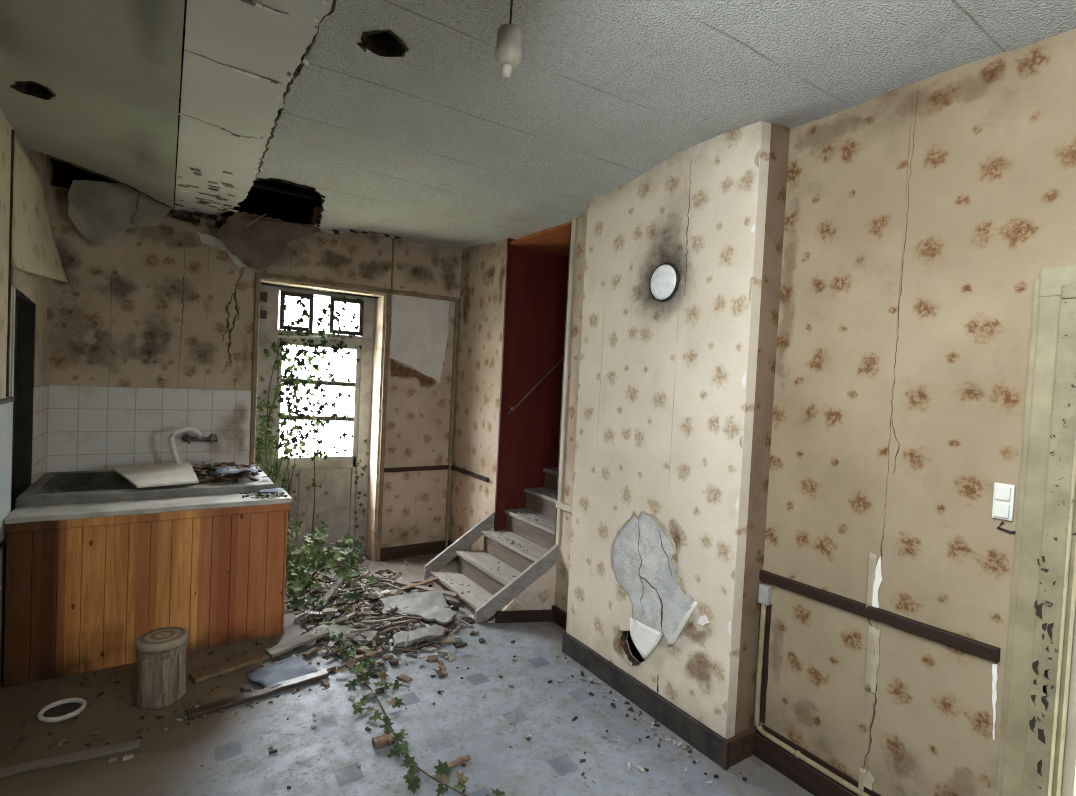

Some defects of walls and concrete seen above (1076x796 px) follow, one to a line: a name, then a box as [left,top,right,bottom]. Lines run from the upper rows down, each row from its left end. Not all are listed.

crack [178,0,346,180]
peeling [169,167,239,228]
crack [880,84,919,560]
spalling [611,509,710,667]
crack [863,685,877,769]